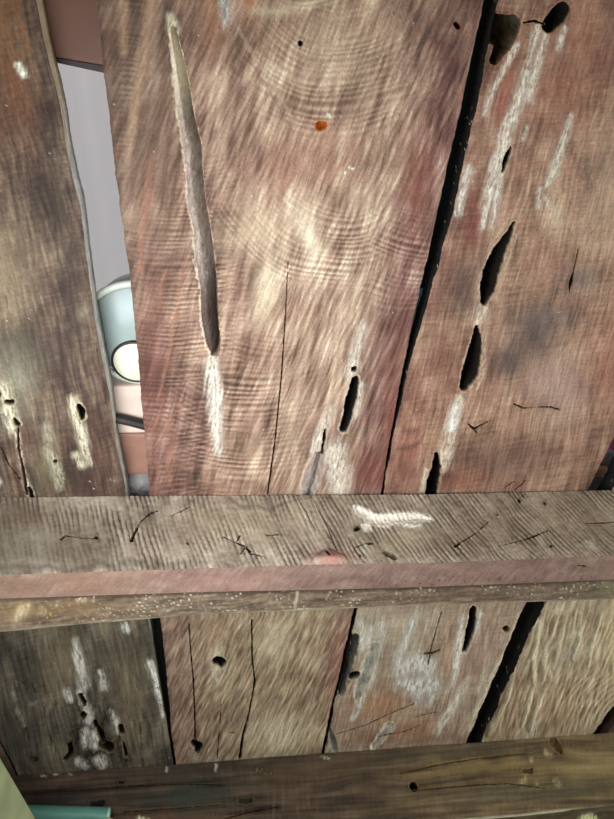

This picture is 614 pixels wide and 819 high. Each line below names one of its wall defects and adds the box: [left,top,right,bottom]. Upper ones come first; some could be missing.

water stain [481,25,547,259]
water stain [454,165,469,215]
crack [263,259,292,496]
crack [510,400,564,414]
crack [126,501,194,545]
crack [450,518,551,551]
water stain [63,638,104,770]
crack [19,616,282,819]
water stain [147,661,164,716]
water stain [393,612,440,707]
crack [420,608,446,667]
water stain [438,617,465,734]